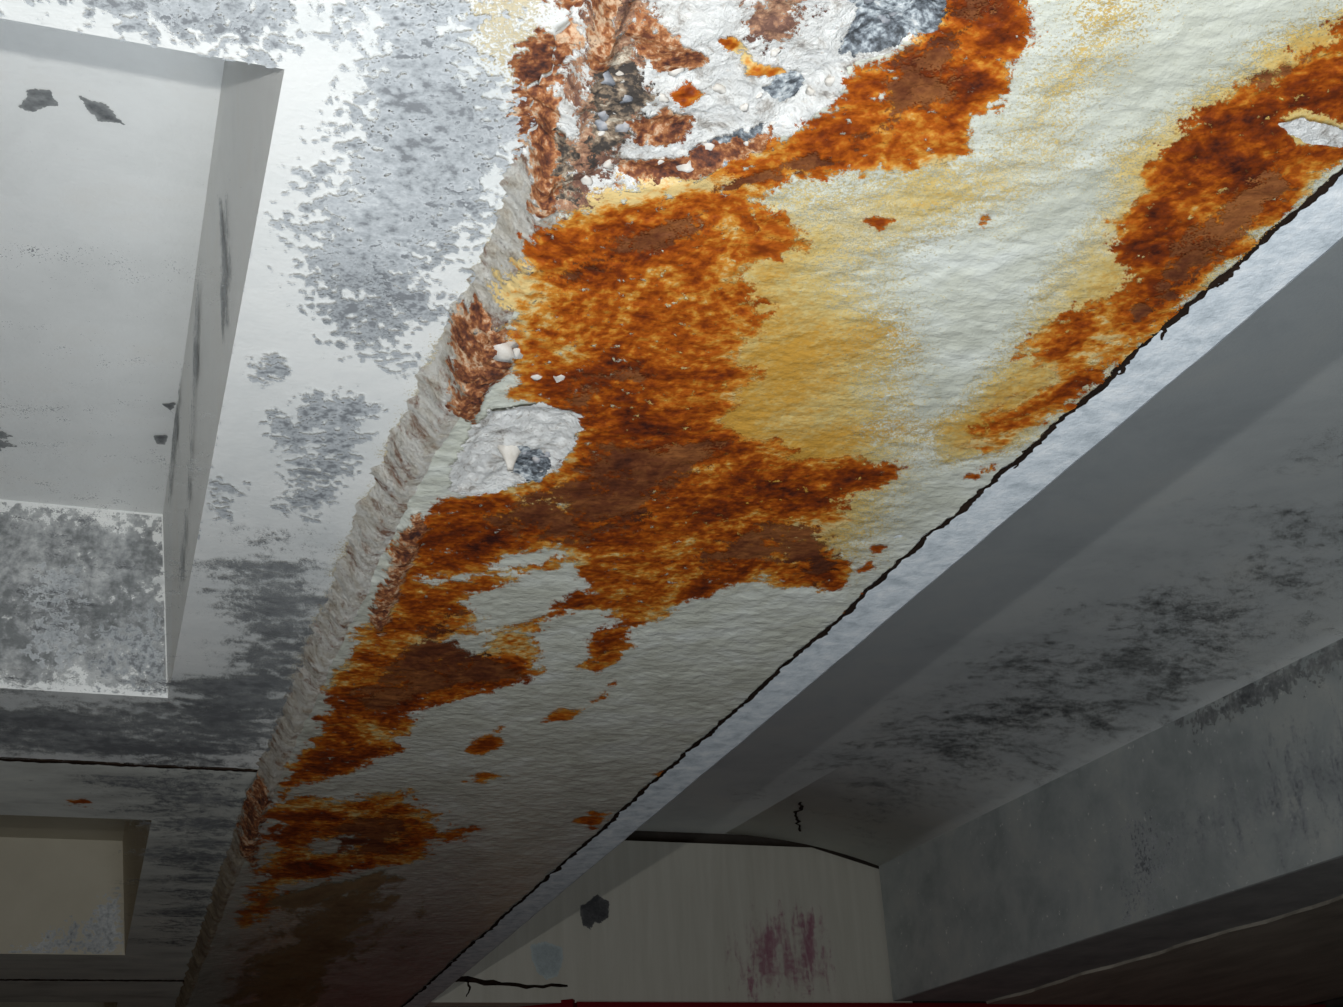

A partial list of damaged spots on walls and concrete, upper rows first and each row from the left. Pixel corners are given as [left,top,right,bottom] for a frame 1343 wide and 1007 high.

leakage [459,0,558,107]
spalling [18,0,948,380]
peeling [197,466,251,540]
peeling [242,354,293,389]
peeling [258,386,389,531]
spalling [448,402,585,497]
spalling [531,372,567,383]
corrosion [234,0,1343,931]
leakage [0,193,434,1007]
crack [401,168,1343,1007]
leakage [716,491,1343,853]